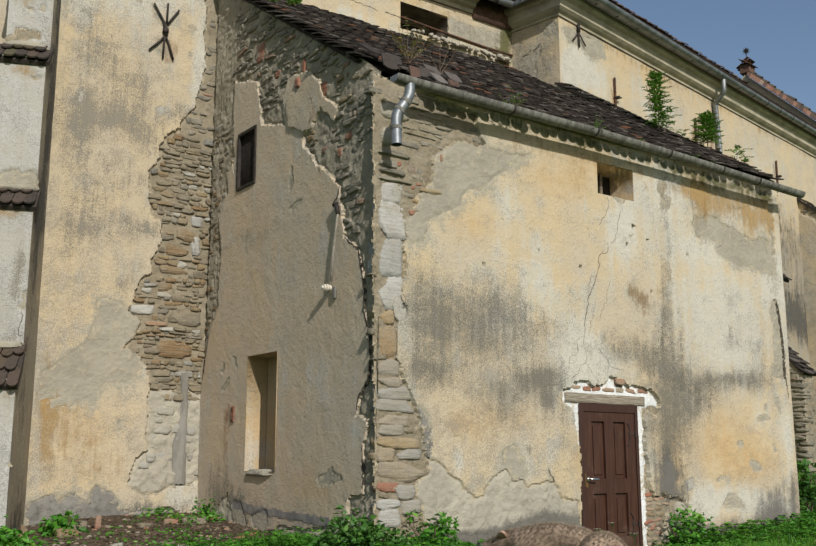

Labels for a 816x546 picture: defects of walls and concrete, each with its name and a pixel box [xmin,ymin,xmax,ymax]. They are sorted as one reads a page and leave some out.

spalling [205,0,581,546]
damp [400,271,567,421]
crack [569,197,624,383]
damp [607,264,770,510]
peeling [692,200,776,282]
spalling [769,283,816,473]
damp [785,278,808,350]
damp [755,475,800,525]